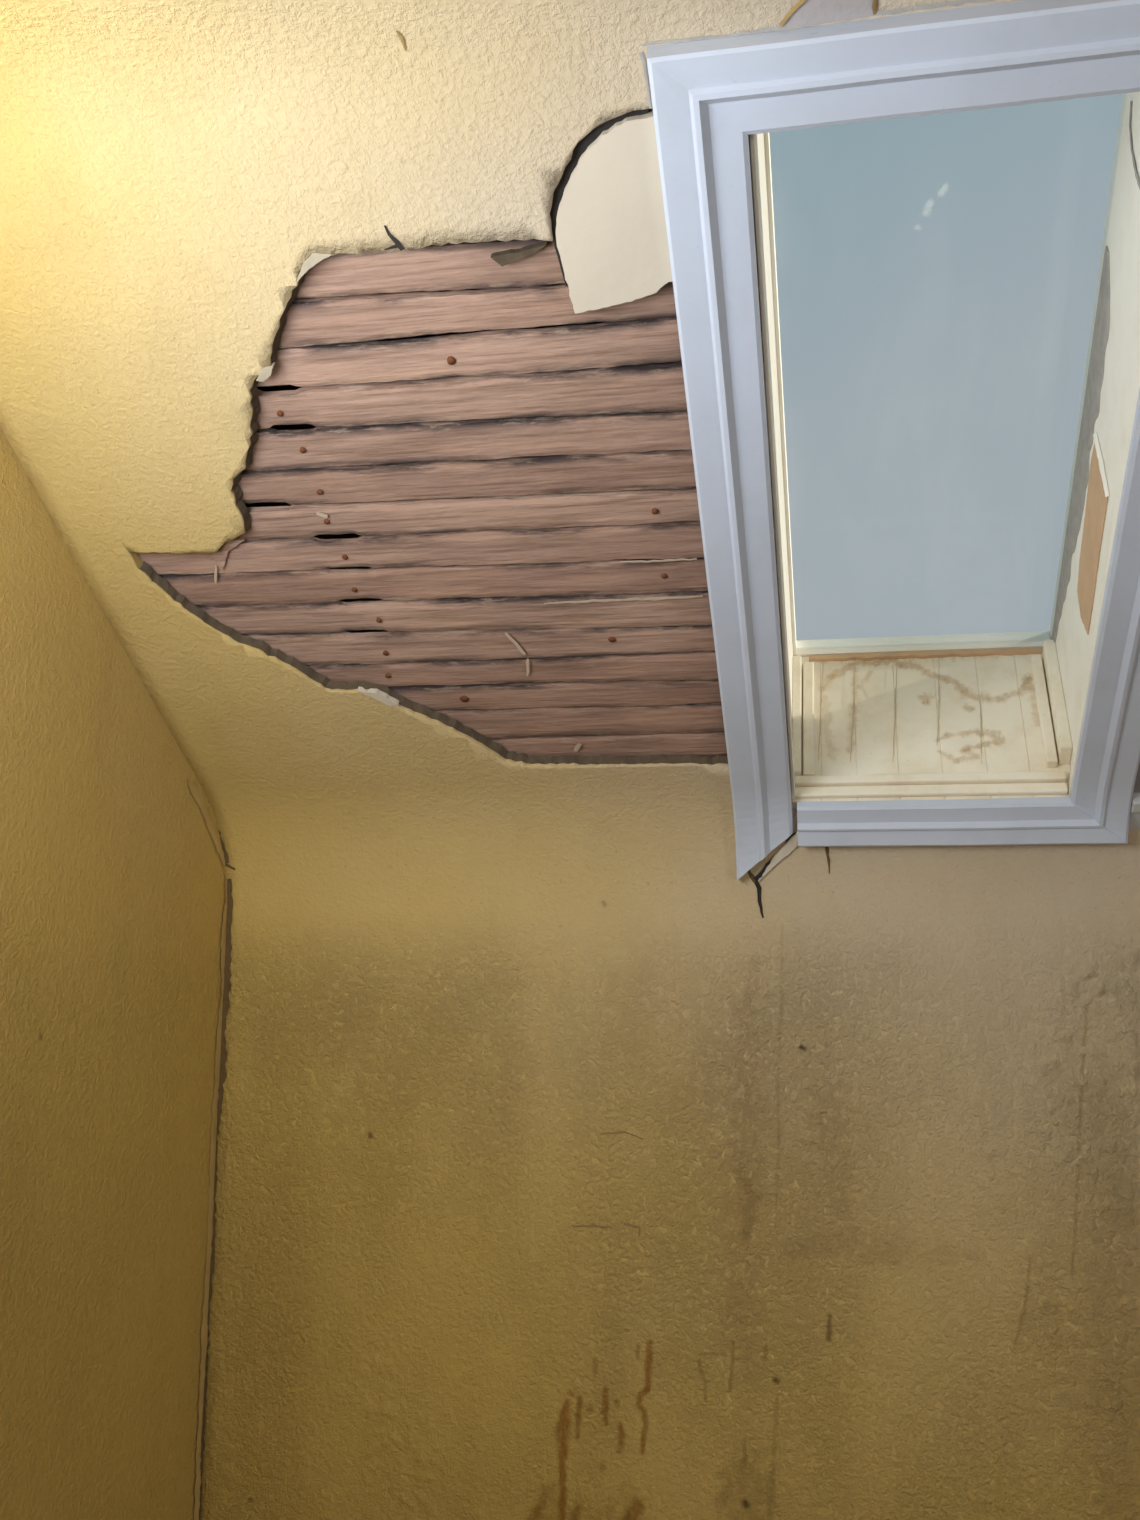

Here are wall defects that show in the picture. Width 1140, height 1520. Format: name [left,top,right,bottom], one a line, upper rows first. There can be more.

crack [550,0,995,286]
crack [1129,101,1140,189]
spalling [384,225,404,251]
spalling [491,241,547,266]
spalling [211,253,332,570]
spalling [140,561,728,765]
crack [748,830,830,918]